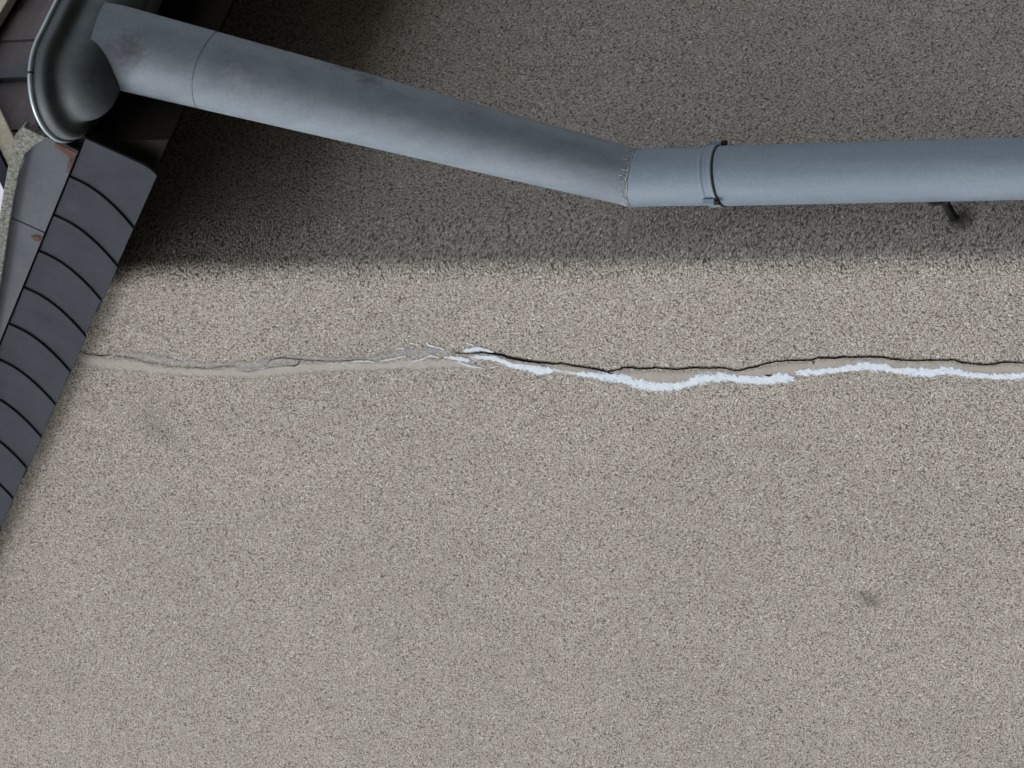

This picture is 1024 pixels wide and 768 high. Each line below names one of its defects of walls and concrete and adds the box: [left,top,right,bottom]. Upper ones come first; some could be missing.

crack [80,351,383,372]
crack [450,352,1024,376]
damp [474,355,1024,393]